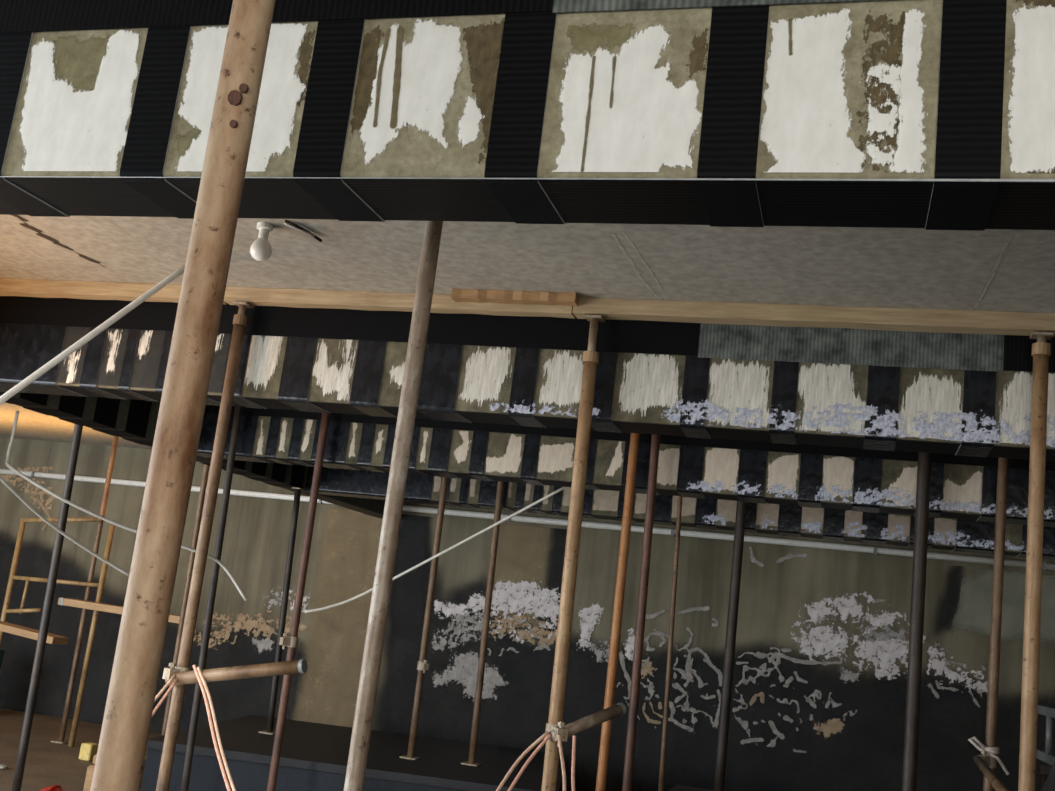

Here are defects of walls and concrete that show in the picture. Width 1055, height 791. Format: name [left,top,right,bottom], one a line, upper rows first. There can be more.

peeling [19,29,141,171]
peeling [350,18,504,164]
peeling [760,8,928,173]
crack [12,215,104,267]
leakage [375,514,567,752]
leakage [562,638,907,791]
peeling [576,591,910,748]
leakage [749,546,807,567]
leakage [936,566,962,631]
peeling [923,635,988,708]
leakage [916,674,1021,791]
leakage [1035,698,1055,791]